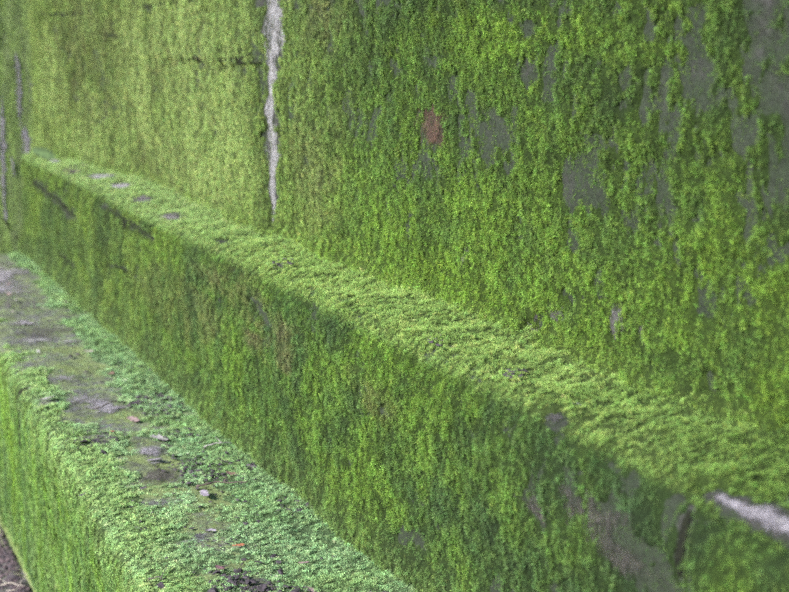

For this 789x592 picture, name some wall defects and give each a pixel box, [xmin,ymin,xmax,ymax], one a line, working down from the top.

crack [674,509,692,578]
crack [715,494,789,533]